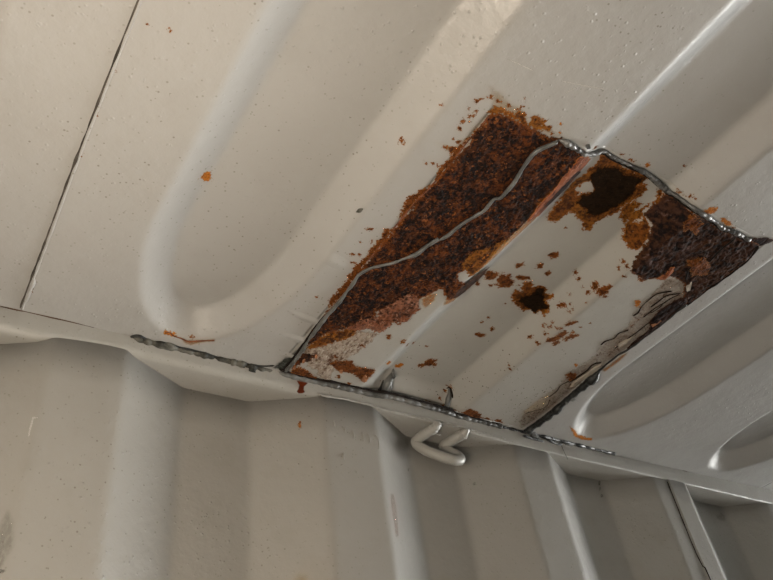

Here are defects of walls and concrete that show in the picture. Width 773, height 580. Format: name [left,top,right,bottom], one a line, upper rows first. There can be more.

rust [307,94,773,352]
rust [163,330,215,344]
peeling [290,329,405,385]
peeling [518,278,692,427]
rust [425,380,502,423]